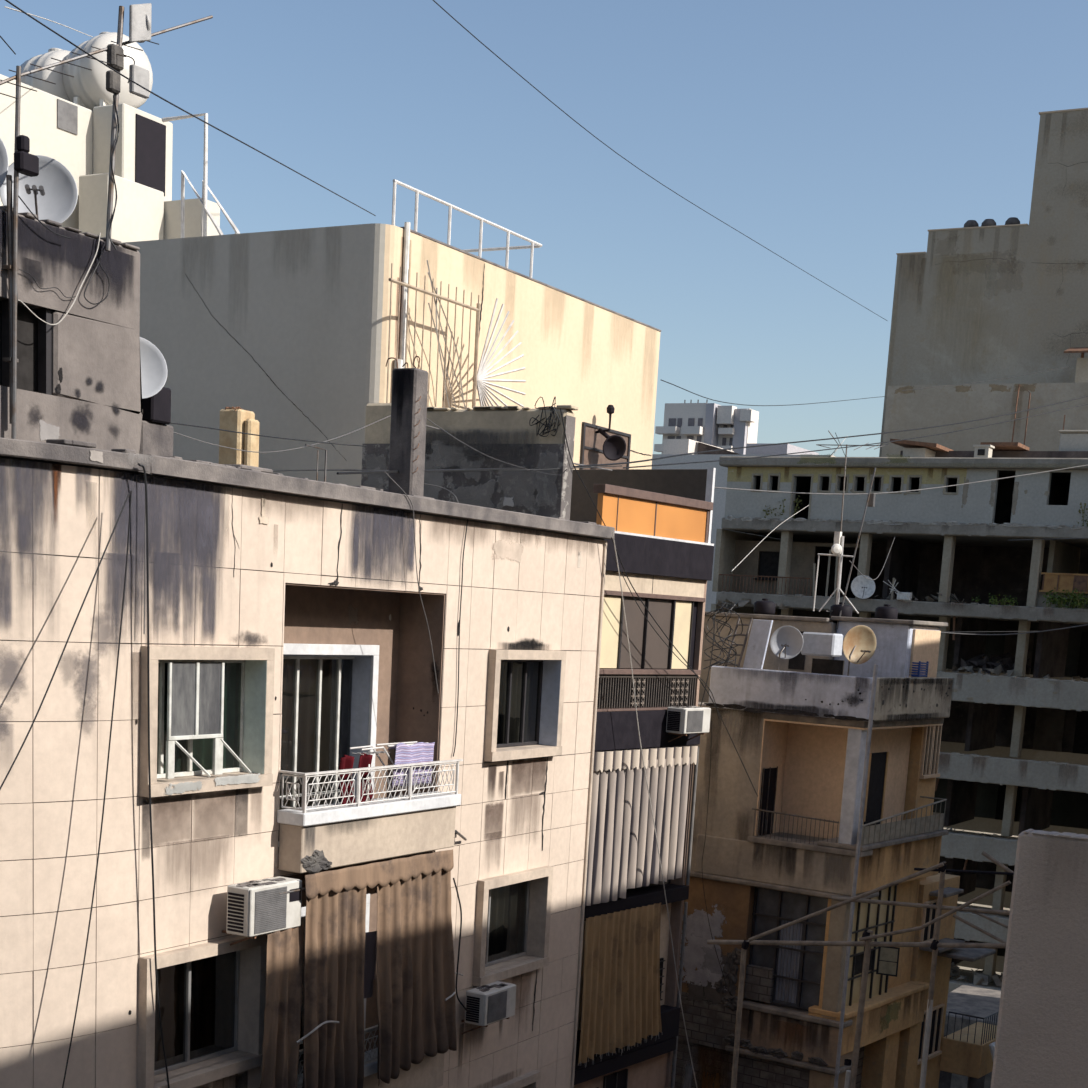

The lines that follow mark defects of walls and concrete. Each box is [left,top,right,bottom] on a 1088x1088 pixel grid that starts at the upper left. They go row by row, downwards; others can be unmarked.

leakage [0,210,133,292]
mould [73,378,104,431]
leakage [78,450,103,515]
peeling [423,444,447,500]
leakage [0,458,49,622]
leakage [109,452,230,633]
leakage [353,505,415,575]
peeling [678,903,741,1011]